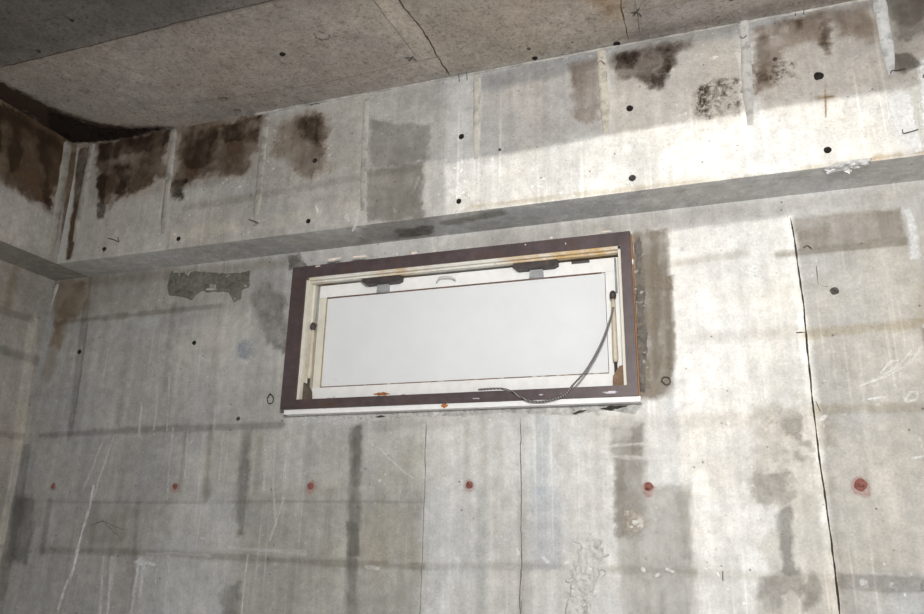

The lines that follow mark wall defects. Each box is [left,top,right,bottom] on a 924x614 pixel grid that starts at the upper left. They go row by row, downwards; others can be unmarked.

water stain [616,44,680,89]
water stain [699,78,743,111]
water stain [0,102,262,218]
water stain [295,116,327,170]
peeling [167,269,250,302]
spalling [563,537,609,614]